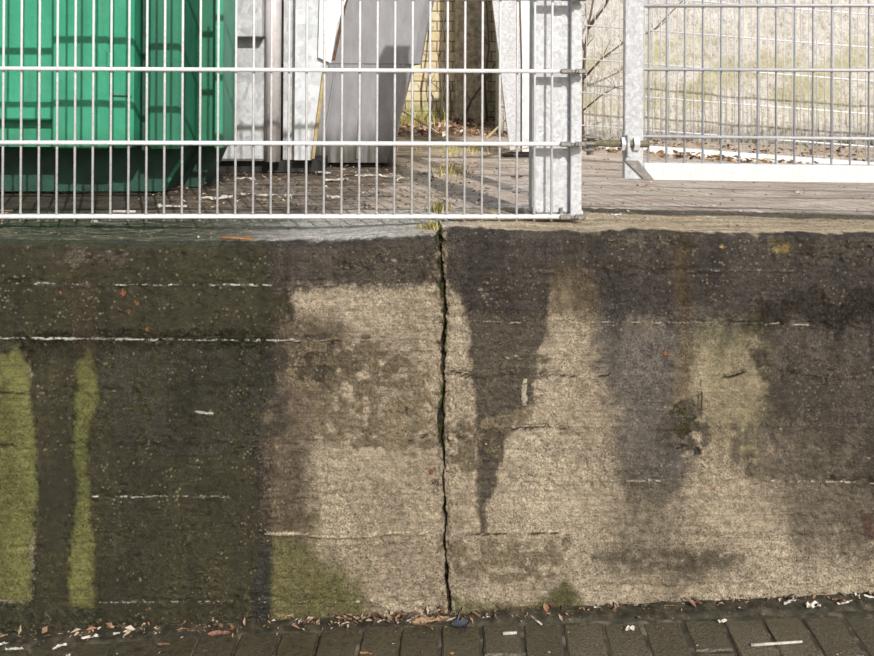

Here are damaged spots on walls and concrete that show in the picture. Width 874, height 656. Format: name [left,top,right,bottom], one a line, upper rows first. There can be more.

leakage [0,238,372,633]
crack [408,225,577,613]
leakage [441,226,874,555]